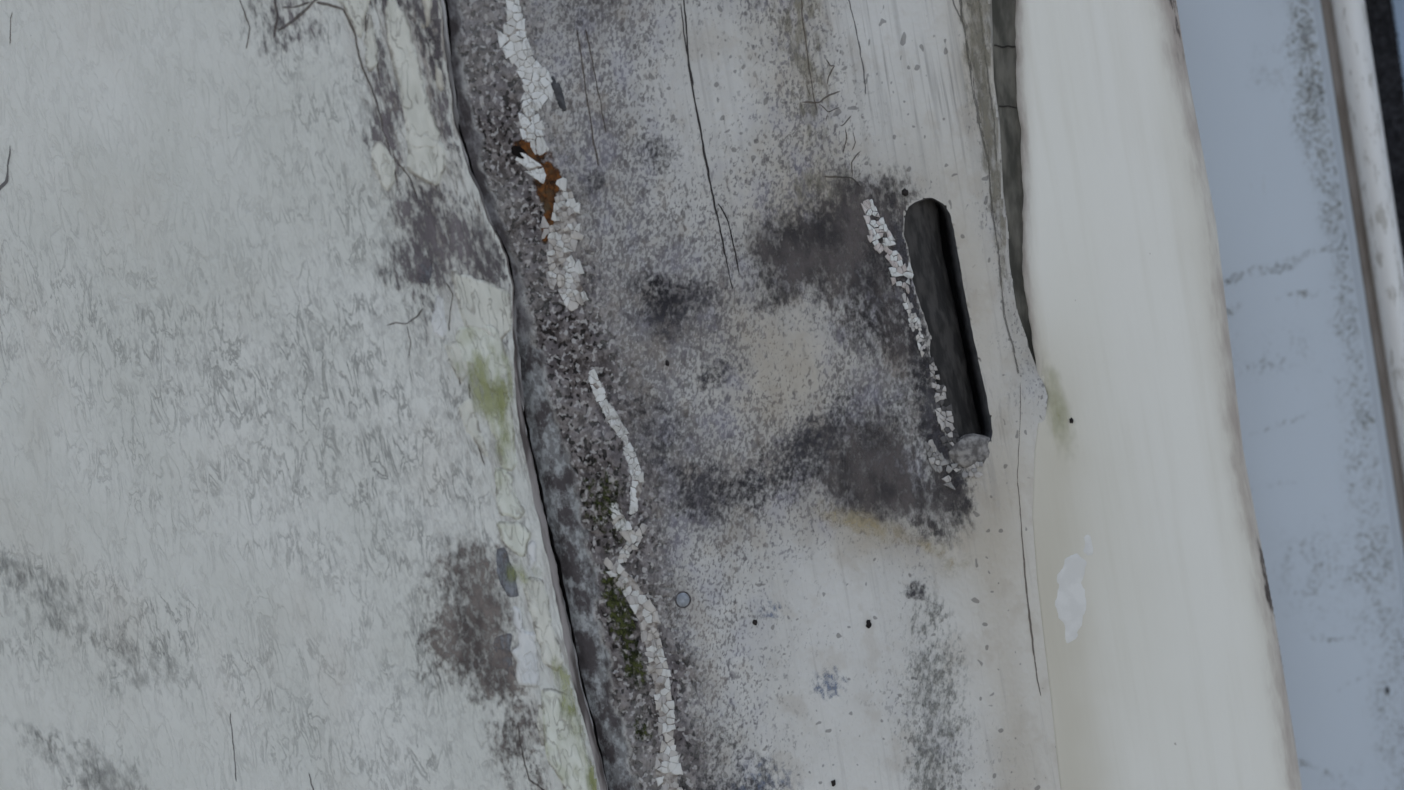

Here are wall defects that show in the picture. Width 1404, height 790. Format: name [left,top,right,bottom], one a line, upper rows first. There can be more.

water stain [363,40,405,169]
water stain [369,0,460,157]
water stain [384,181,510,299]
crack [440,0,496,231]
corrosion [511,139,561,243]
crack [577,30,606,165]
crack [681,0,740,289]
crack [389,284,471,398]
peeling [337,0,607,790]
water stain [633,176,972,536]
water stain [427,541,543,785]
peeling [1055,535,1093,643]